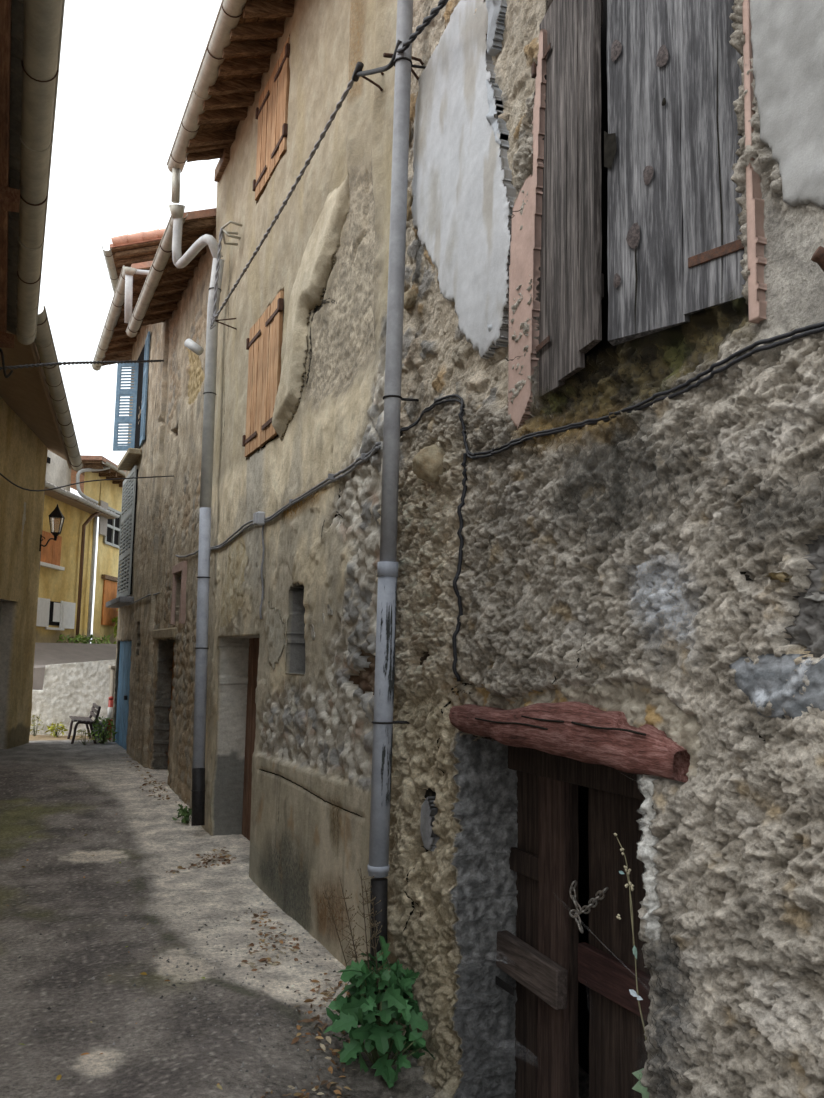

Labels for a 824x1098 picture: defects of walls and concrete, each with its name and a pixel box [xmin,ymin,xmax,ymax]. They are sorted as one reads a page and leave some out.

peeling [411,0,517,359]
peeling [750,0,824,209]
leakage [261,839,311,928]
crack [259,769,364,820]